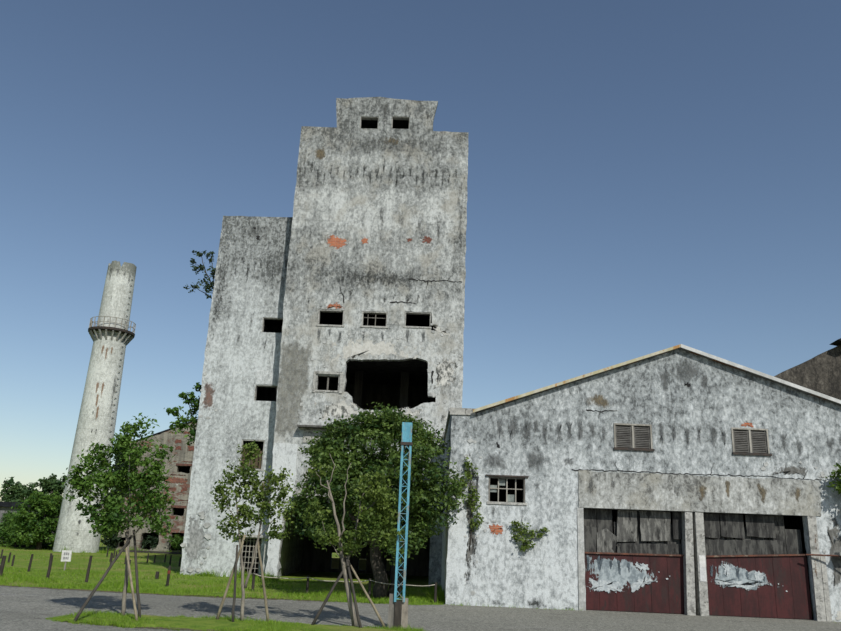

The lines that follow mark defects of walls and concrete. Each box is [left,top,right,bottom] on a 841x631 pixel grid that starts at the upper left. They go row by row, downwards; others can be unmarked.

damp [299,149,424,188]
crack [390,275,462,304]
spalling [323,332,423,368]
spalling [200,372,218,419]
damp [275,344,309,434]
spalling [309,392,383,425]
spalling [394,350,461,486]
damp [497,421,605,442]
damp [660,426,726,444]
spalling [464,454,503,580]
peeling [586,555,668,593]
peeling [710,561,779,591]